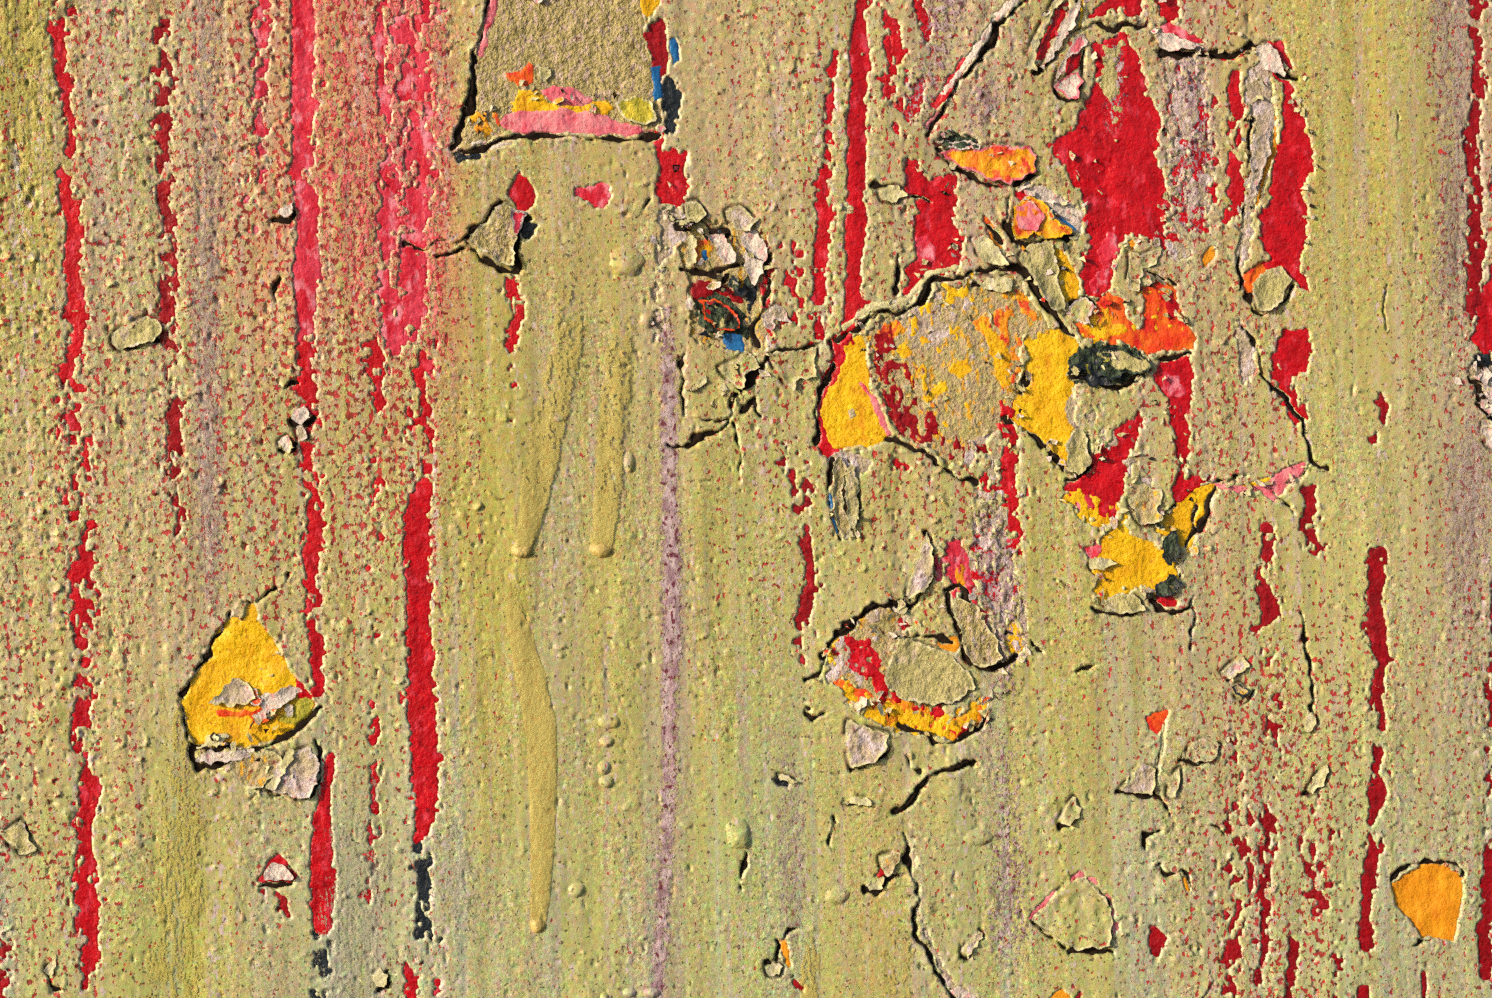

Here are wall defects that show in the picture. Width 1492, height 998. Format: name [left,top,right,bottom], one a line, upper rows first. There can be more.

peeling [402,172,538,275]
peeling [449,0,1318,650]
peeling [1453,264,1492,449]
peeling [179,572,323,799]
peeling [803,530,1031,772]
peeling [1222,657,1254,704]
peeling [1305,712,1316,734]
crack [891,756,977,998]
peeling [1028,871,1119,955]
peeling [1390,858,1465,946]
crack [1051,989,1081,998]